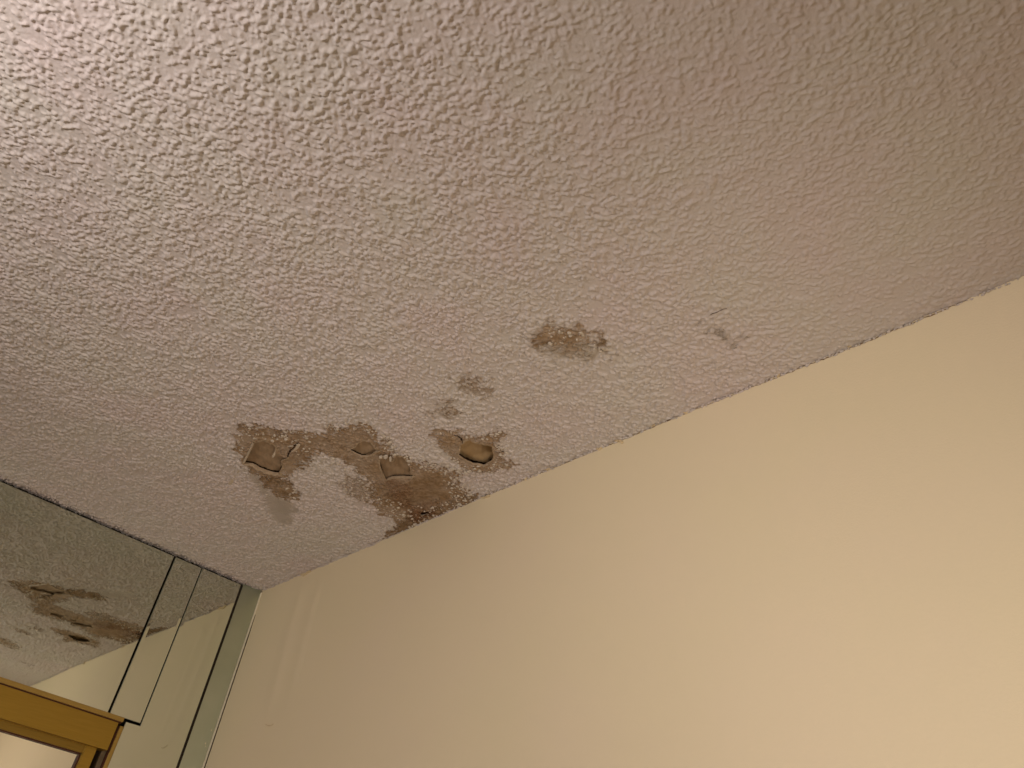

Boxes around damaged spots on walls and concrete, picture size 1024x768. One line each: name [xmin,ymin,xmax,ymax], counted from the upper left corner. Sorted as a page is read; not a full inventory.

damp [532,321,612,356]
damp [233,421,520,539]